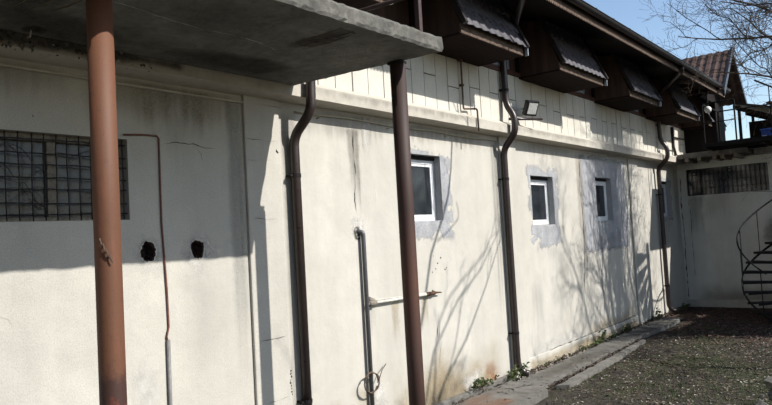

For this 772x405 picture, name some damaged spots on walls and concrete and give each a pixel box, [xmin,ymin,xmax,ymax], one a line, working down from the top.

spalling [0,26,87,59]
spalling [114,51,180,72]
spalling [132,234,164,271]
spalling [183,232,212,267]
leakage [425,371,491,405]